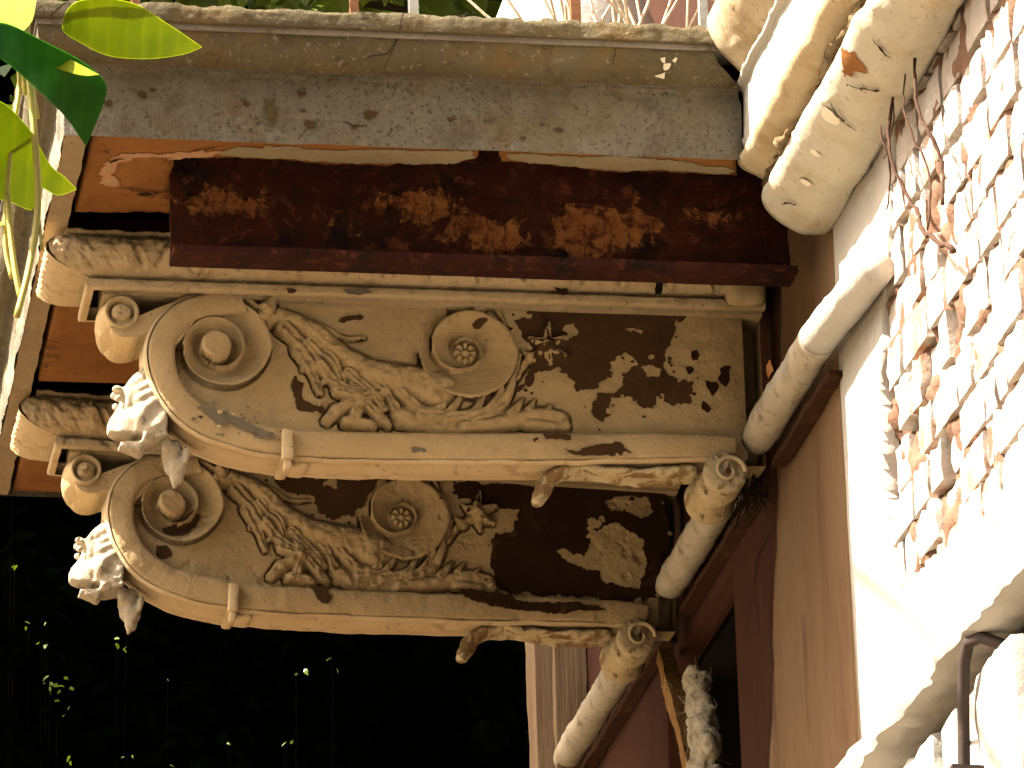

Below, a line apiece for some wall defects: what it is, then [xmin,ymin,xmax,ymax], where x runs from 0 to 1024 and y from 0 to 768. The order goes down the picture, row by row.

peeling [655,57,677,79]
spalling [841,46,867,77]
spalling [99,145,475,187]
corrosion [170,181,279,220]
corrosion [373,185,665,258]
corrosion [682,207,748,228]
peeling [291,376,326,414]
peeling [508,311,731,457]
peeling [439,481,677,614]